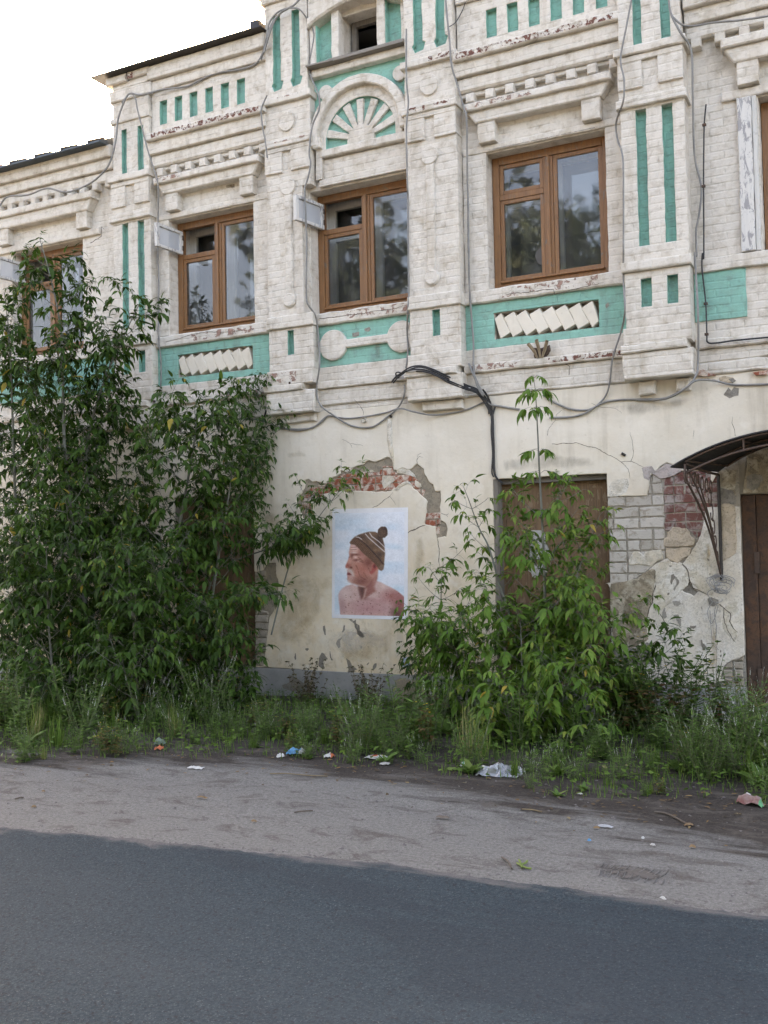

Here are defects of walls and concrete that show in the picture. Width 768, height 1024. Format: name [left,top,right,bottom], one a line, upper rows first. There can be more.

peeling [428,13,613,61]
crack [547,410,640,475]
spalling [297,458,448,539]
spalling [608,460,746,687]
spalling [294,619,377,673]